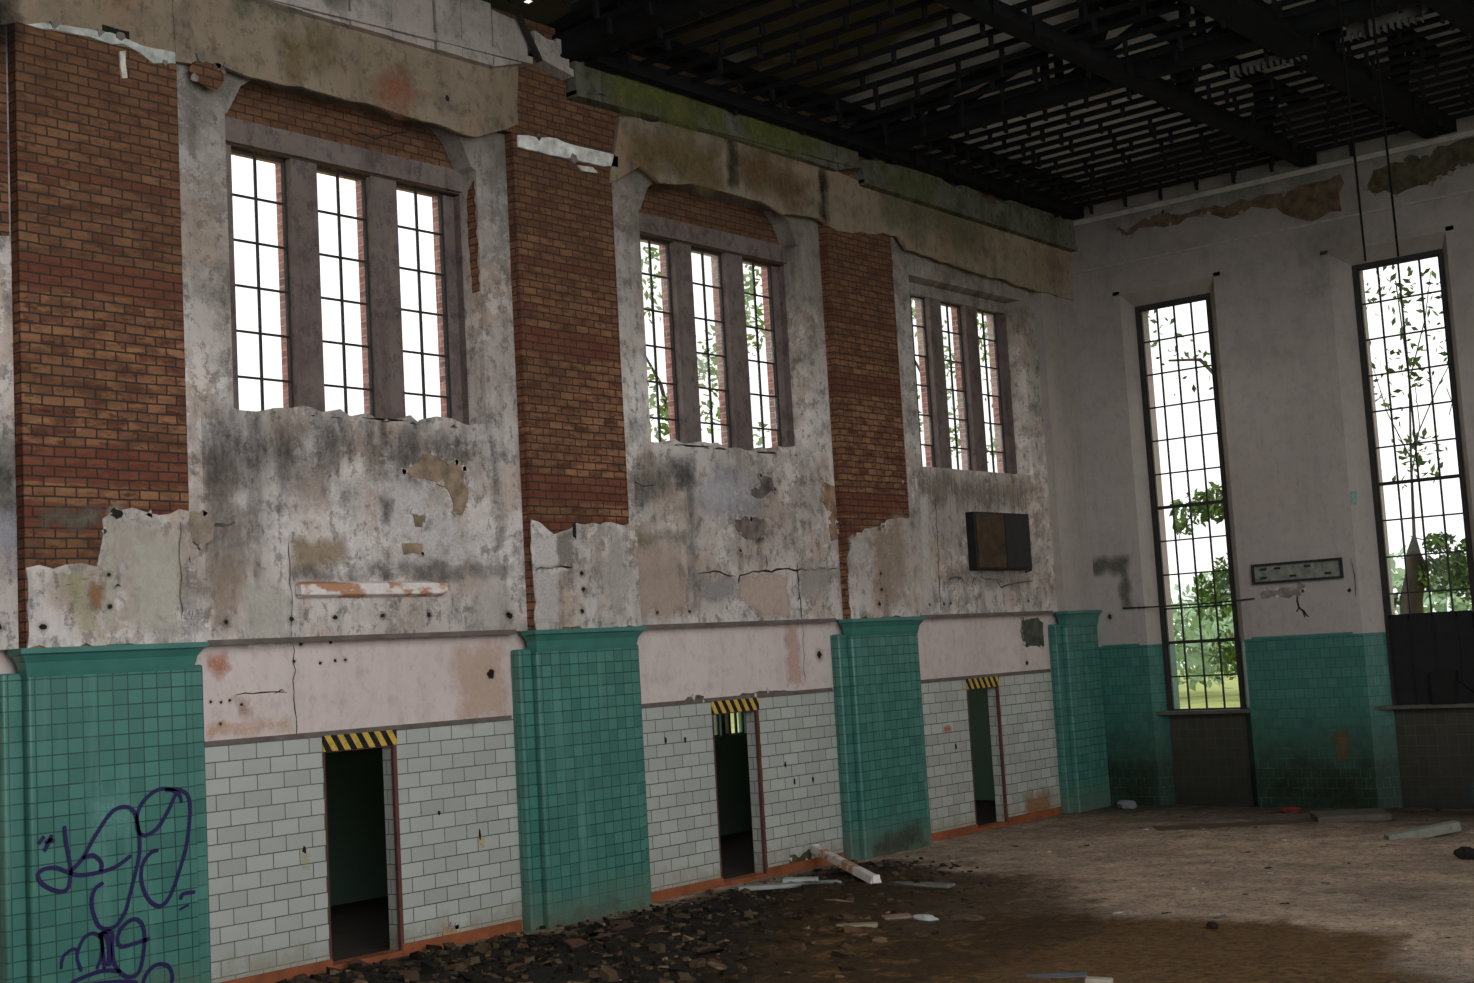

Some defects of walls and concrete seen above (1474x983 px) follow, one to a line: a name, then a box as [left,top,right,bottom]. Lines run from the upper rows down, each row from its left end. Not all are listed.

water stain [636,139,800,199]
water stain [819,172,828,220]
peeling [1117,174,1344,239]
peeling [1363,137,1474,197]
flaking render [0,21,230,577]
flaking render [513,133,631,622]
flaking render [818,232,905,556]
peeling [129,534,178,630]
peeling [367,450,513,629]
spalling [1020,616,1045,665]